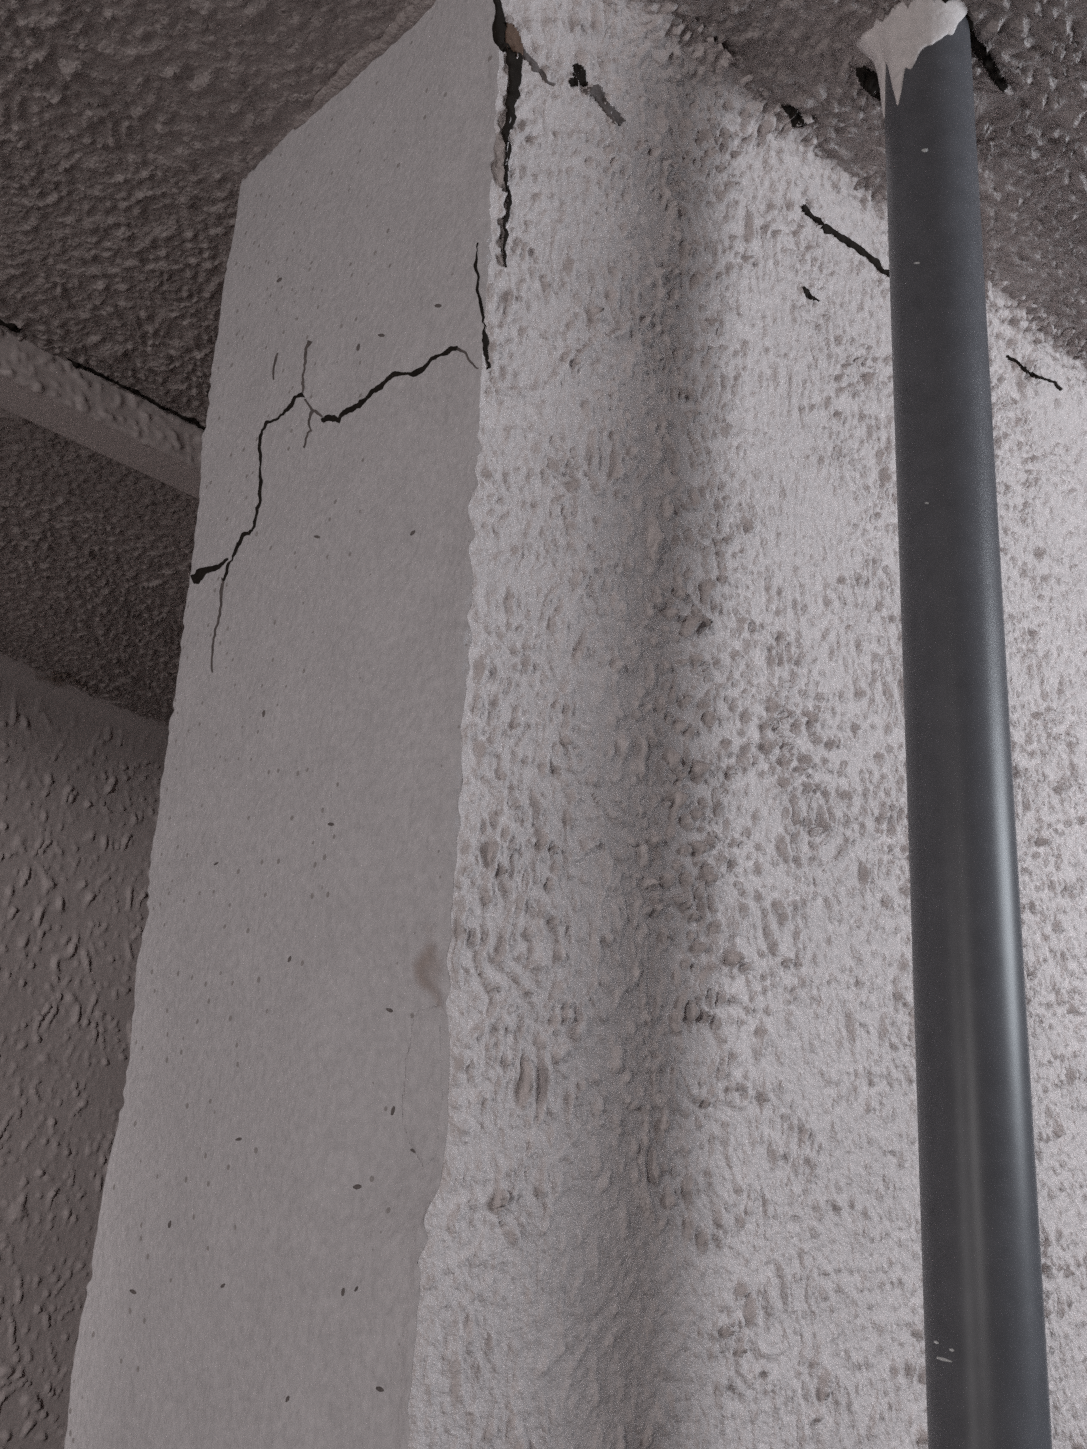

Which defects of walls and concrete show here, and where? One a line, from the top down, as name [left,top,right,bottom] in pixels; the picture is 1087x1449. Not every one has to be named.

crack [801,204,890,279]
crack [802,286,820,302]
crack [190,0,556,672]
crack [1006,355,1063,391]